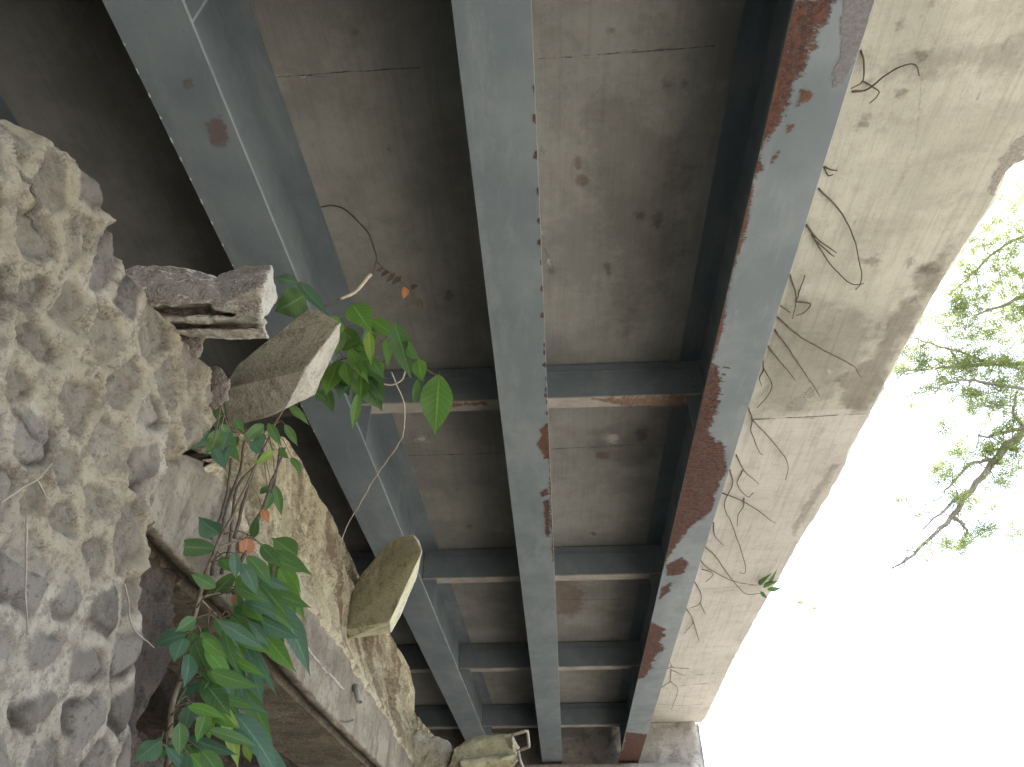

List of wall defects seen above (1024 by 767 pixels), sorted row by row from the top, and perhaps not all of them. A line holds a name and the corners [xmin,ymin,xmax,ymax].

peeling [831,0,874,87]
corrosion [659,0,836,599]
crack [753,413,857,421]
corrosion [537,381,554,561]
corrosion [638,623,666,679]